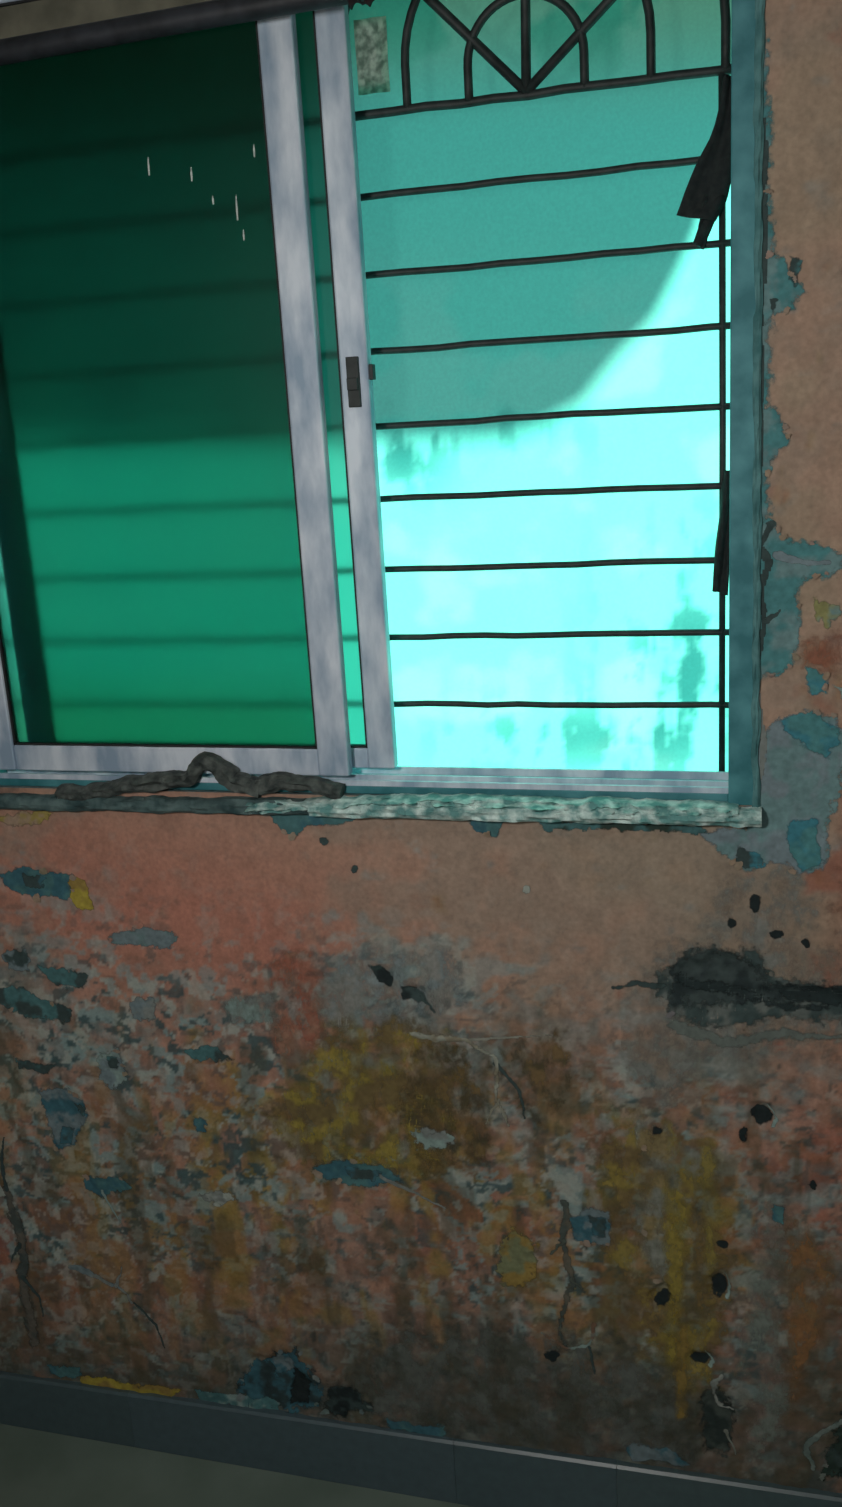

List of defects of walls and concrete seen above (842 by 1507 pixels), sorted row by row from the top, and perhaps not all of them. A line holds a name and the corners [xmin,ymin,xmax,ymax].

peeling [539,39,842,875]
peeling [0,866,94,911]
peeling [108,927,178,949]
peeling [0,949,88,1025]
peeling [183,1045,232,1063]
water stain [225,947,572,1182]
peeling [15,1058,89,1151]
peeling [410,1127,455,1150]
peeling [82,1174,132,1226]
peeling [312,1158,446,1209]
spalling [236,1346,374,1417]
spalling [803,1411,842,1481]